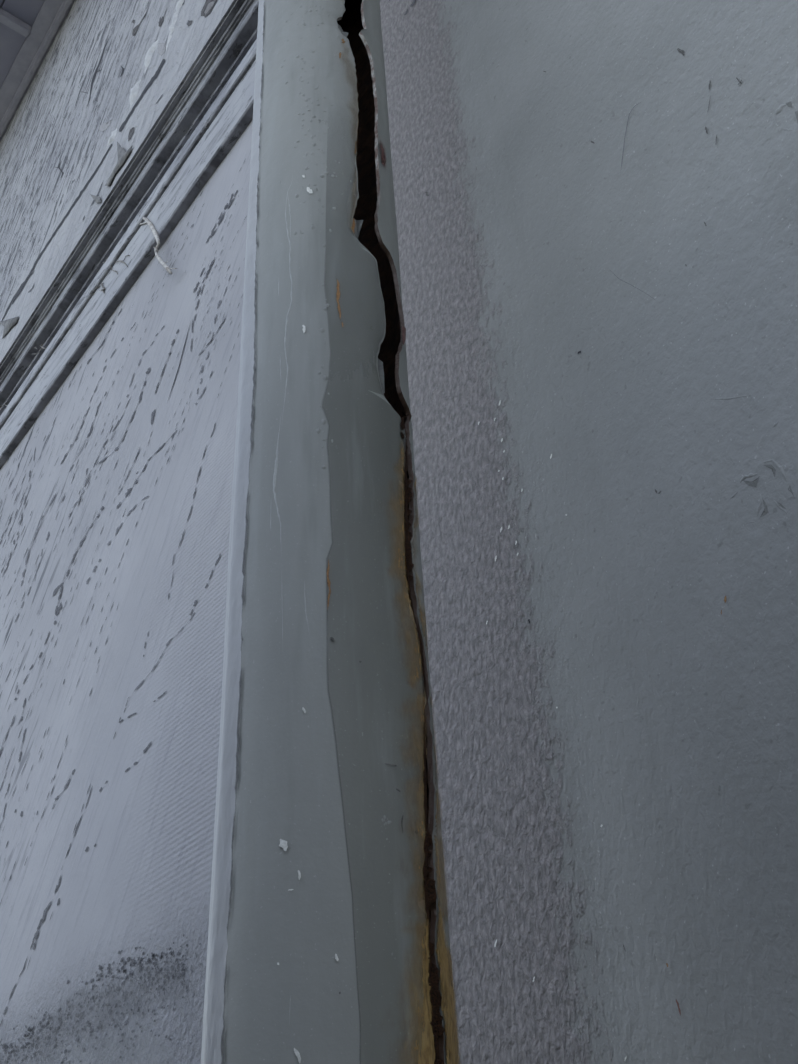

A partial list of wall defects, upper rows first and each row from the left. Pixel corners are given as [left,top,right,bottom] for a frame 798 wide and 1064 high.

crack [353,219,363,239]
crack [377,359,385,393]
corrosion [396,449,427,685]
crack [400,414,445,1064]
corrosion [411,694,460,1064]
mould [1,935,202,1064]